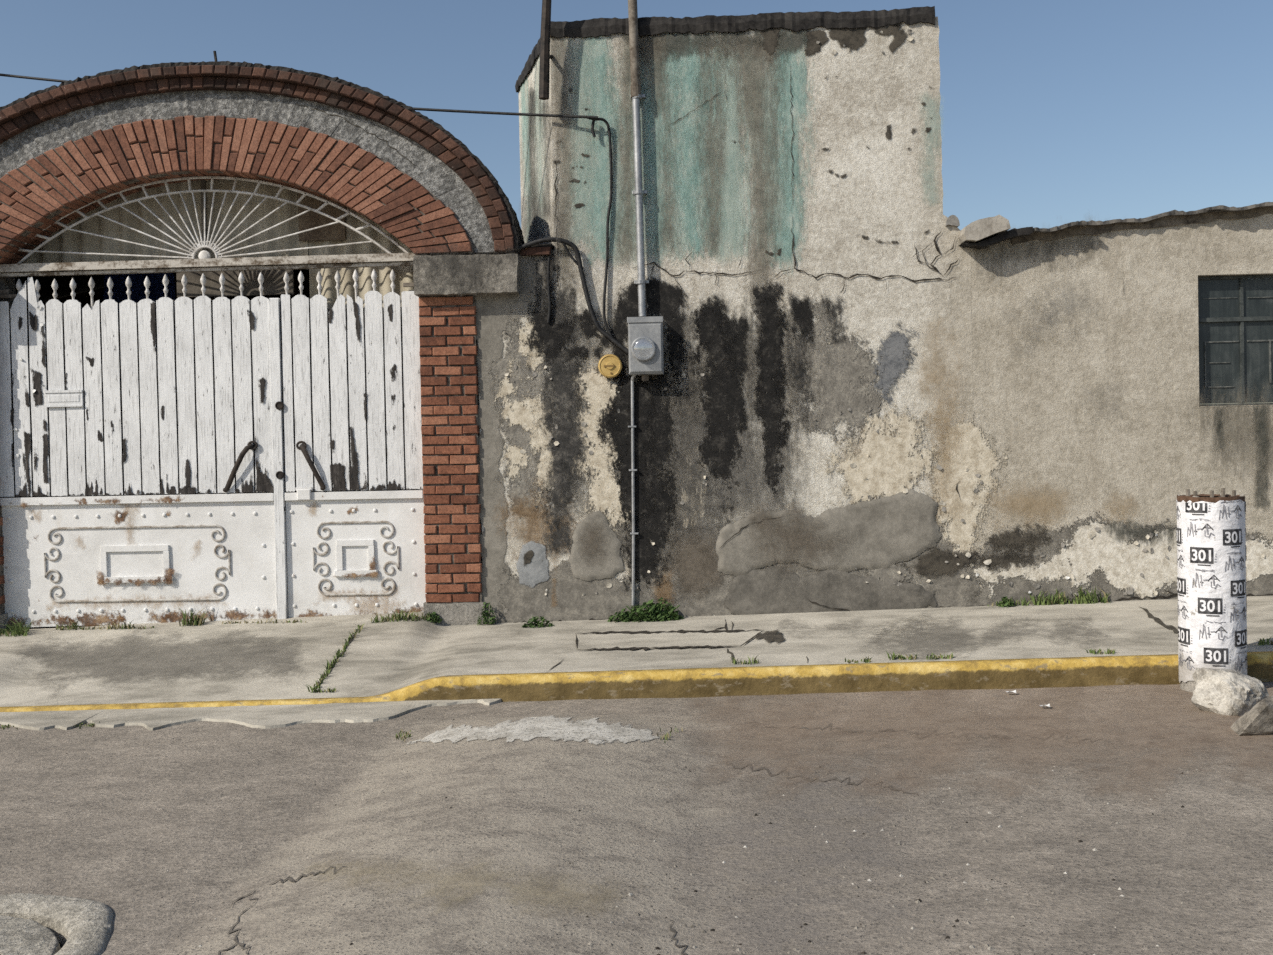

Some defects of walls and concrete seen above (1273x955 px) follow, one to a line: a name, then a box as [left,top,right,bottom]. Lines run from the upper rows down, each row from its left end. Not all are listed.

crack [633,67,958,295]
leakage [521,28,845,593]
peeling [10,306,49,498]
rust [75,498,128,524]
peeling [68,459,211,496]
peeling [330,393,422,491]
flaking render [475,249,736,624]
peeling [786,298,1178,608]
leakage [1202,399,1273,506]
rust [8,612,126,628]
rust [96,568,175,586]
rust [149,609,277,623]